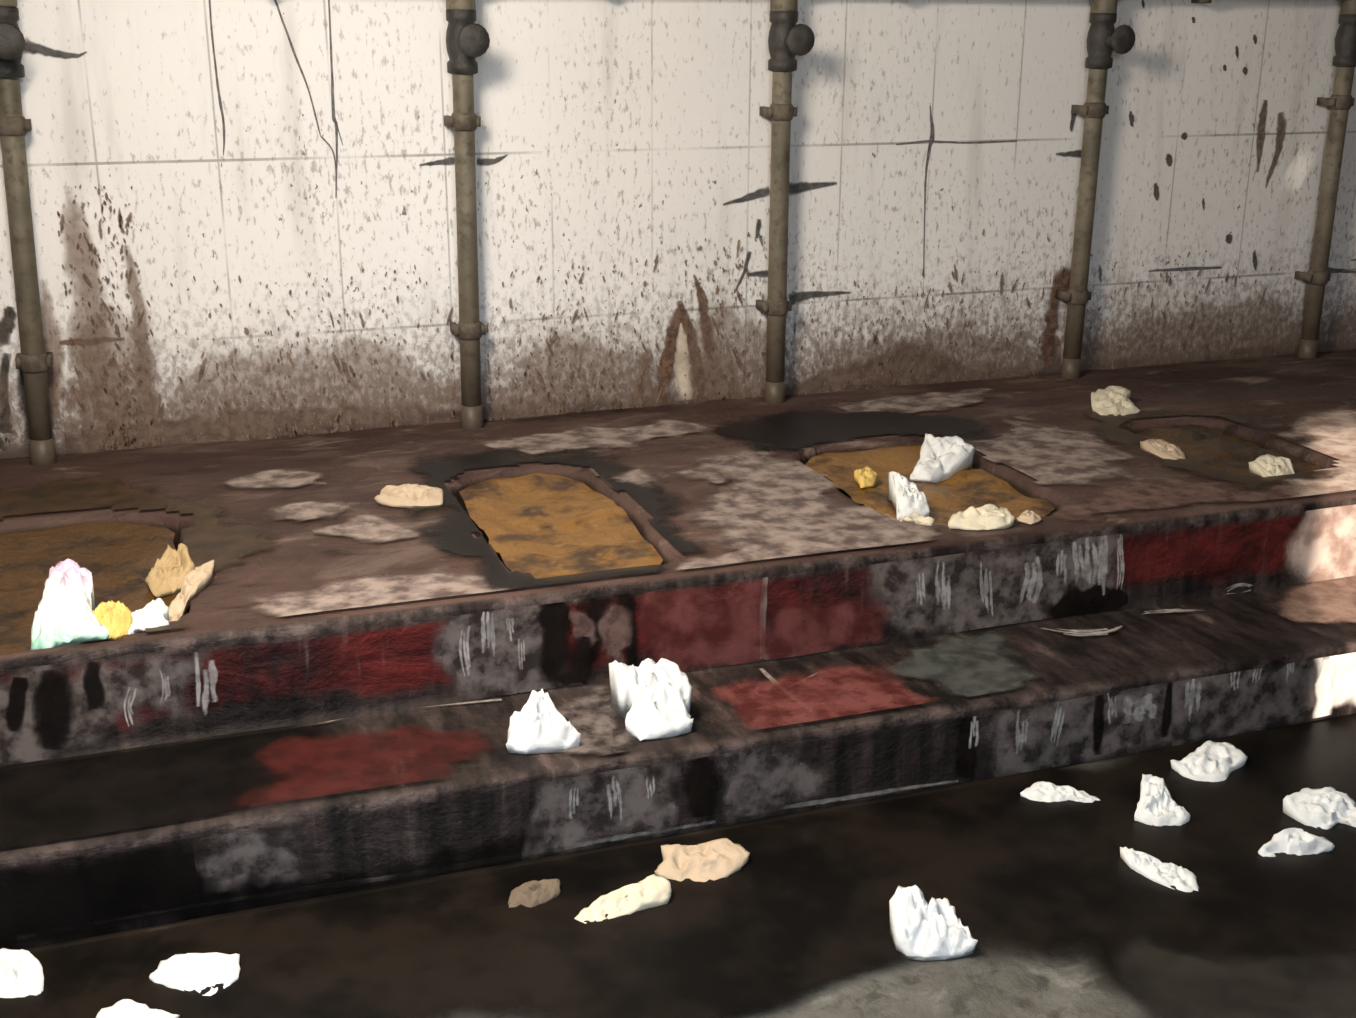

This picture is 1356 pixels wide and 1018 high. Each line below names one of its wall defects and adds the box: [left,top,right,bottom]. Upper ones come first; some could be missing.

corrosion [0,306,29,437]
corrosion [41,211,157,431]
water stain [57,184,461,451]
corrosion [635,275,738,404]
water stain [676,232,767,404]
water stain [713,410,993,450]
peeling [680,451,937,570]
peeling [719,667,928,729]
peeling [570,534,1119,672]
water stain [891,632,1035,697]
water stain [0,656,1356,1018]
peeling [721,746,822,815]